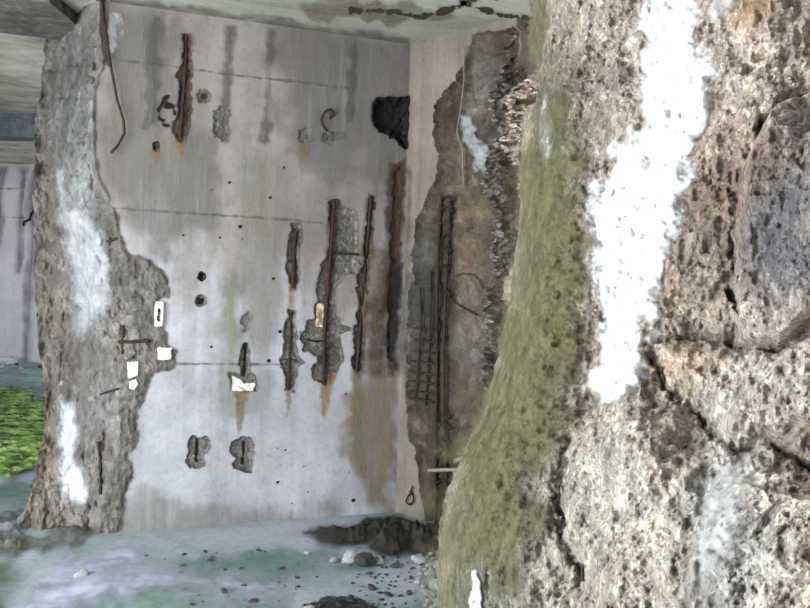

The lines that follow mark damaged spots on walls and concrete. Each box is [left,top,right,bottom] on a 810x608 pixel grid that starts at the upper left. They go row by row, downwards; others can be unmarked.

spalling [157,33,193,153]
hole [372,95,410,150]
damp [19,170,36,234]
efflorescence [586,0,732,403]
spalling [16,0,177,534]
spalling [279,193,376,415]
rust [347,162,405,512]
spalling [405,0,810,608]
spalling [185,435,210,469]
crack [648,357,734,453]
crack [776,449,810,471]